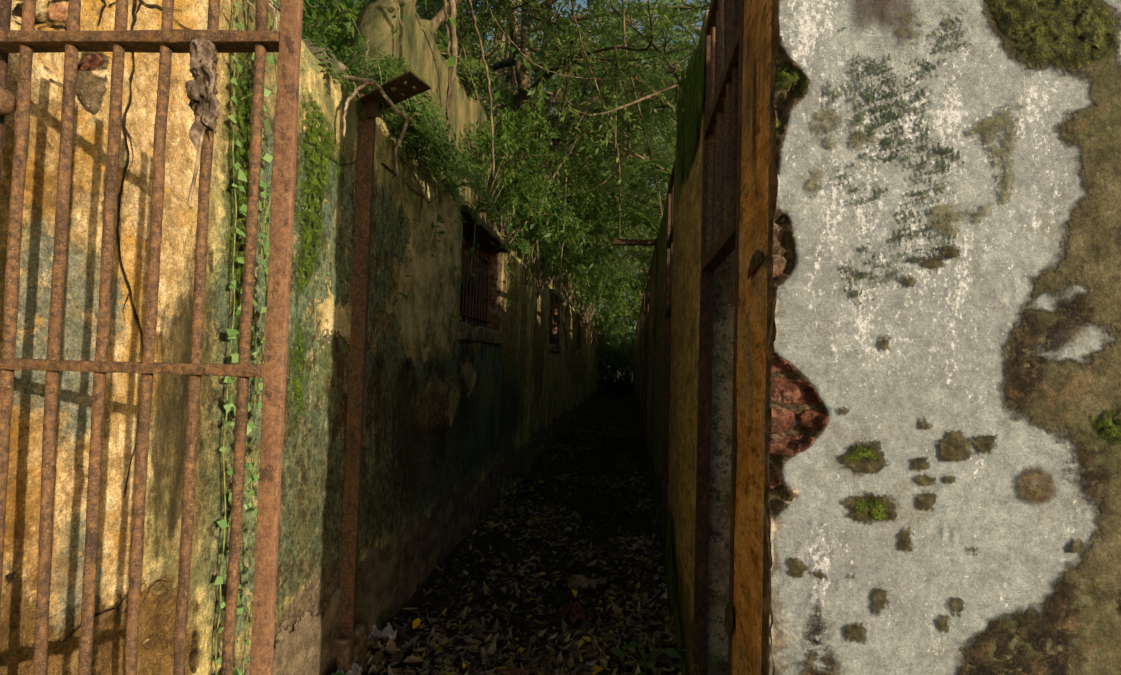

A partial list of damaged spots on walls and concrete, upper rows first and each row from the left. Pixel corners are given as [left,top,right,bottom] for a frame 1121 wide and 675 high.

spalling [76,52,111,114]
crack [98,0,192,354]
peeling [131,53,189,287]
spalling [747,207,796,287]
crack [124,432,137,498]
corrosion [332,337,350,451]
damp [369,340,475,503]
spalling [769,352,829,571]
peeling [960,0,1121,675]